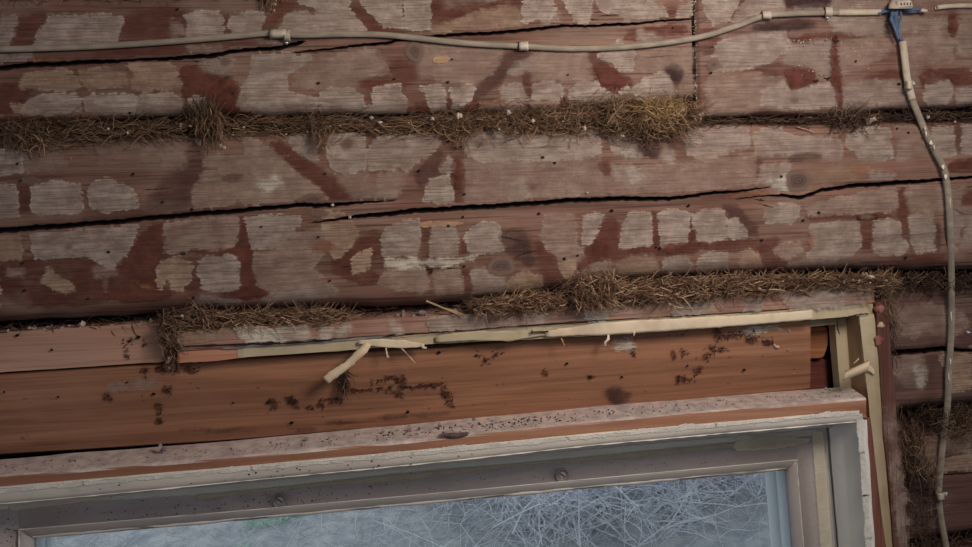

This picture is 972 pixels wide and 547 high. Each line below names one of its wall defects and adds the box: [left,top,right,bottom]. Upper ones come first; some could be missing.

peeling [173,9,266,70]
crack [0,11,691,71]
peeling [278,0,785,40]
peeling [235,48,407,117]
peeling [419,1,972,279]
peeling [0,149,139,218]
peeling [154,133,544,305]
crack [0,176,972,233]
peeling [0,224,139,293]